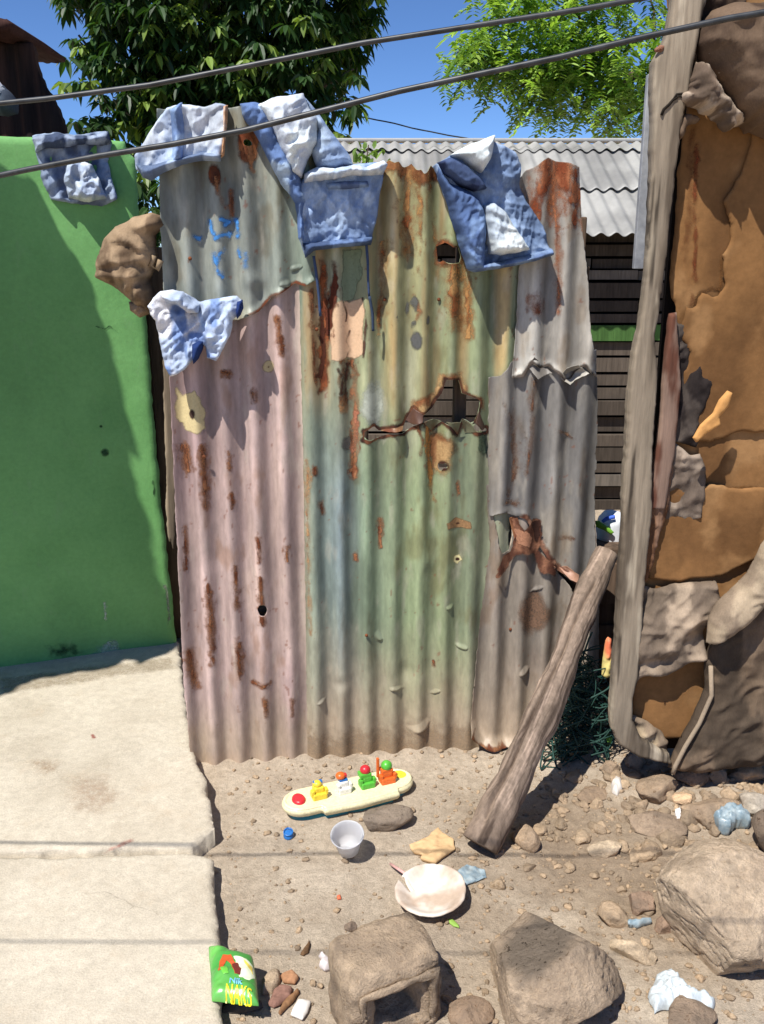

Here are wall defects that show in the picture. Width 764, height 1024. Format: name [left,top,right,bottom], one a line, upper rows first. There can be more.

rust [238,132,259,173]
rust [383,160,477,339]
rust [530,158,581,265]
rust [248,261,359,479]
rust [411,373,483,412]
rust [180,443,211,510]
rust [514,520,541,548]
rust [255,537,265,627]
rust [206,583,216,666]
rust [235,642,272,715]